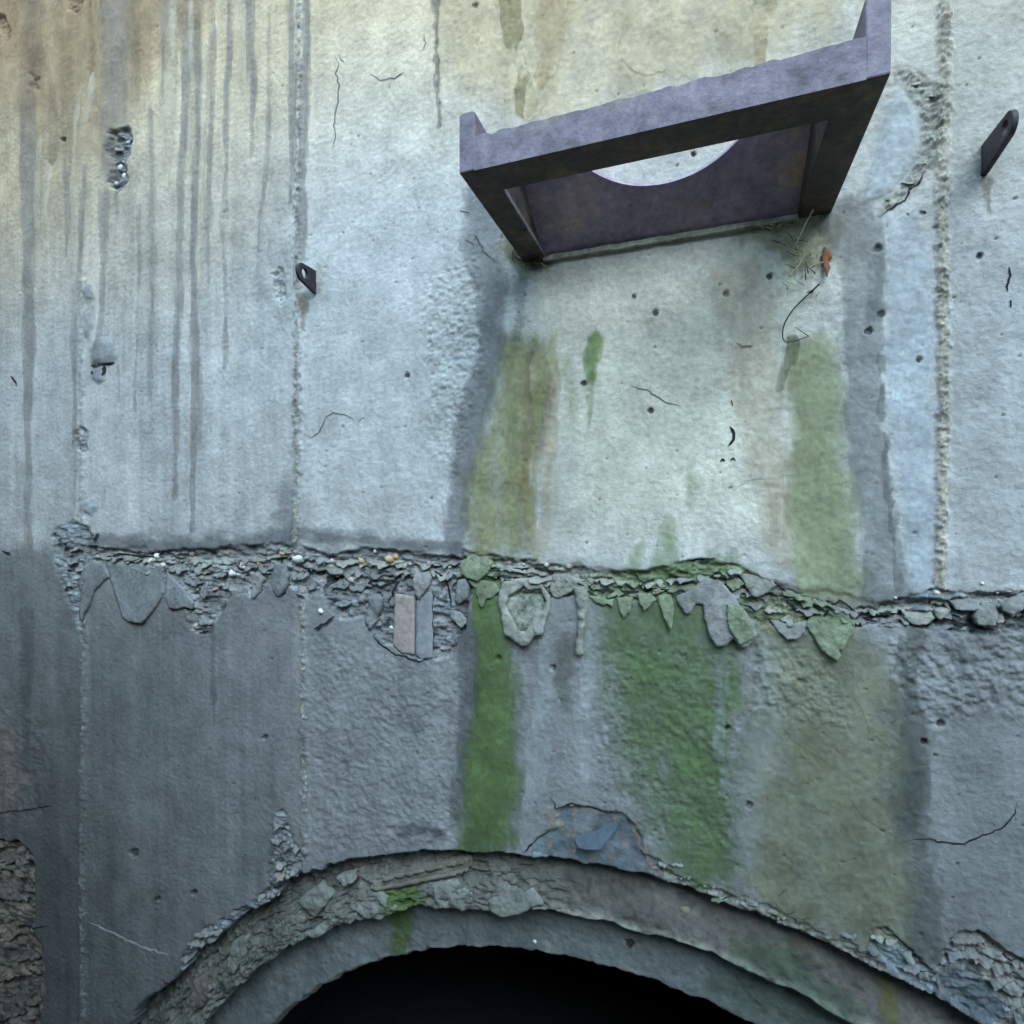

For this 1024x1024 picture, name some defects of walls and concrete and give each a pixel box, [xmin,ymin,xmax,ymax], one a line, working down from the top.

spalling [103,125,133,192]
damp [165,0,206,188]
damp [191,163,203,280]
damp [289,0,310,255]
crack [333,55,344,144]
crack [880,171,925,217]
crack [302,412,364,438]
spalling [52,518,1024,662]
spalling [0,839,47,1024]
spalling [180,810,303,971]
peeling [531,806,1024,1024]
crack [852,800,1018,845]